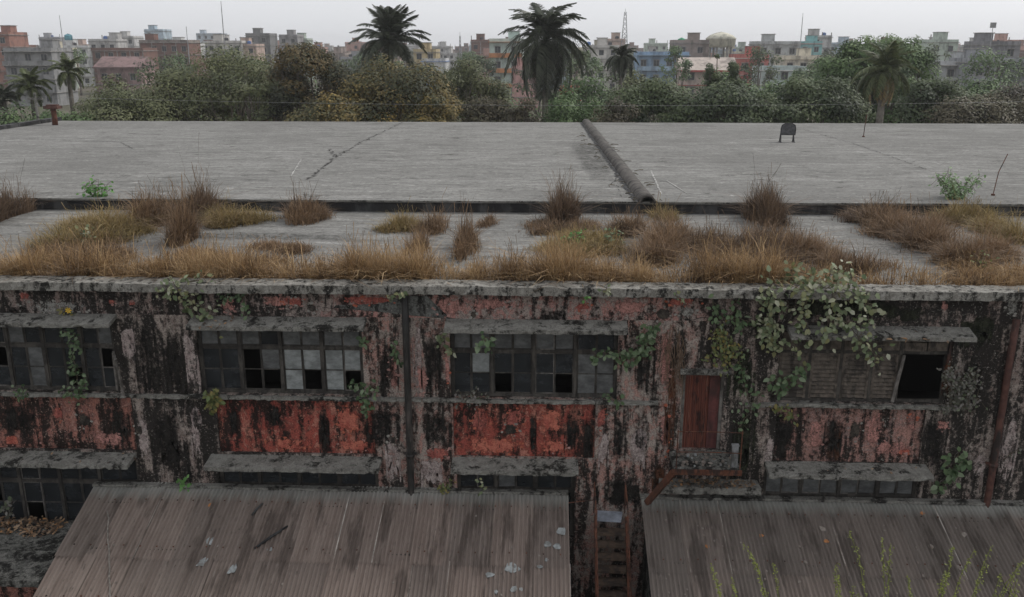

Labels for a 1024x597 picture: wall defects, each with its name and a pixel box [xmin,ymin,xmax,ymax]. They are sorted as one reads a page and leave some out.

crack [307,125,394,179]
leakage [952,314,995,409]
peeling [54,407,122,446]
leakage [110,324,201,481]
peeling [336,405,368,453]
peeling [424,407,570,461]
leakage [564,411,645,508]
peeling [847,413,911,457]
leakage [973,415,1019,489]